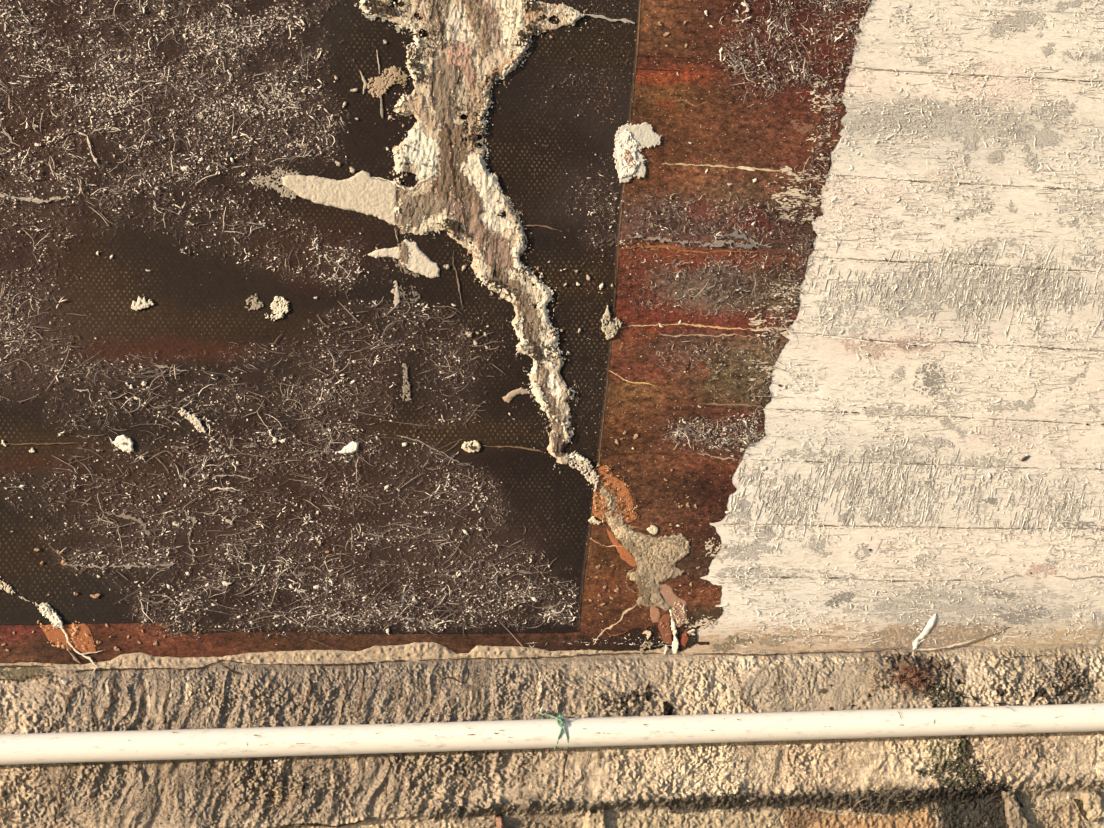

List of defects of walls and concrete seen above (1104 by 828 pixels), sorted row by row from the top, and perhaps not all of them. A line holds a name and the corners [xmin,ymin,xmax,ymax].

spalling [377,0,439,64]
hole [454,100,487,152]
rust [840,332,932,359]
peeling [592,465,639,567]
peeling [650,584,688,646]
crack [0,602,1052,733]
water stain [880,652,966,707]